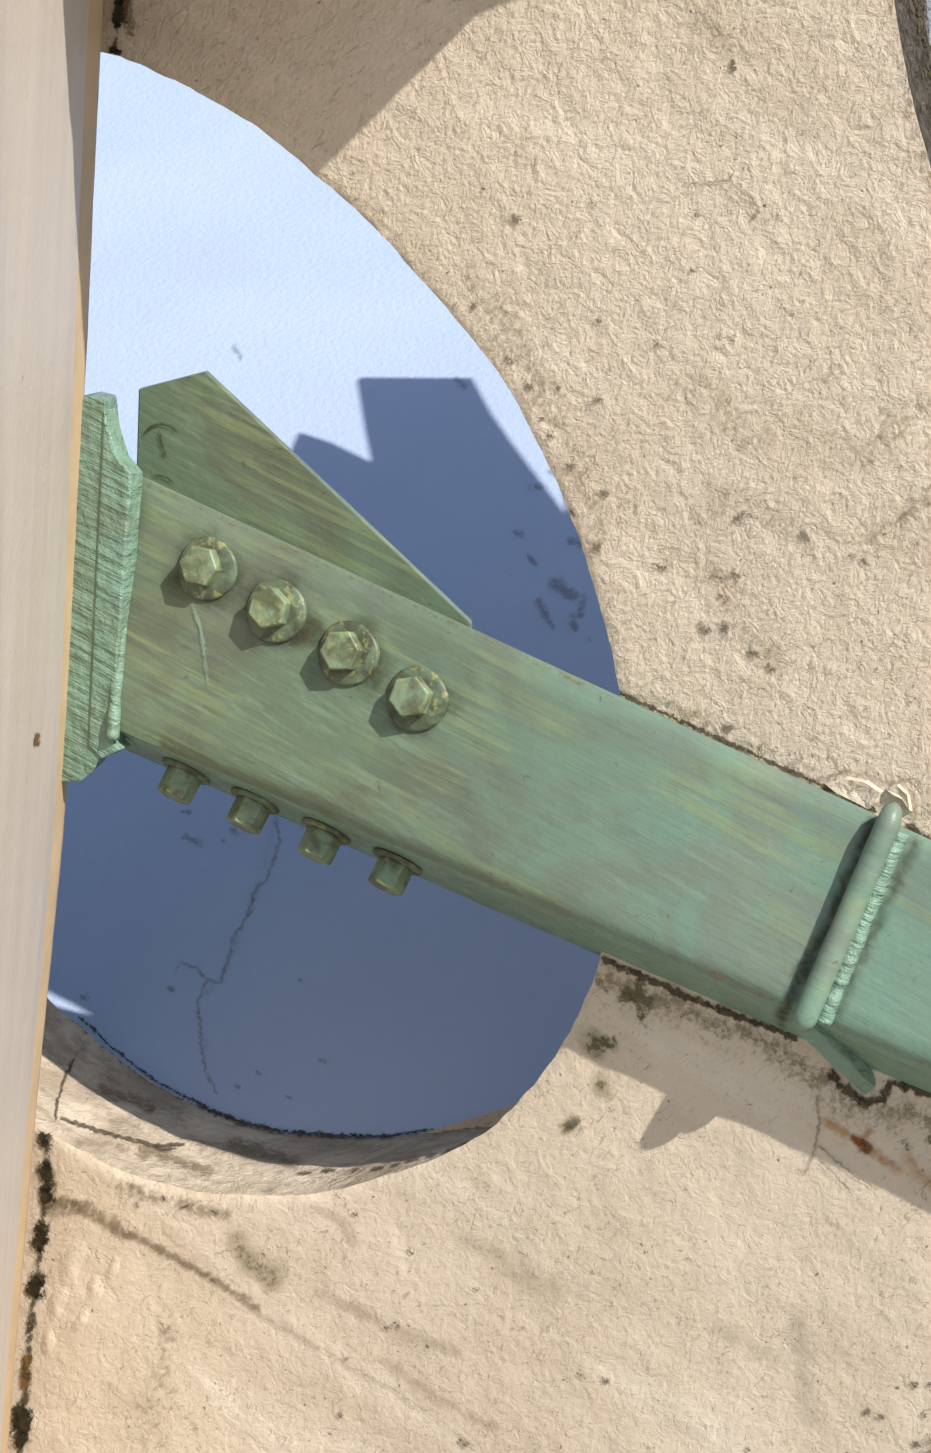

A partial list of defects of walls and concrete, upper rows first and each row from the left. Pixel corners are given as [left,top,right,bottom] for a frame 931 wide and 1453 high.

water stain [108,0,134,55]
crack [691,172,760,220]
rust [826,1121,884,1161]
water stain [23,1131,81,1333]